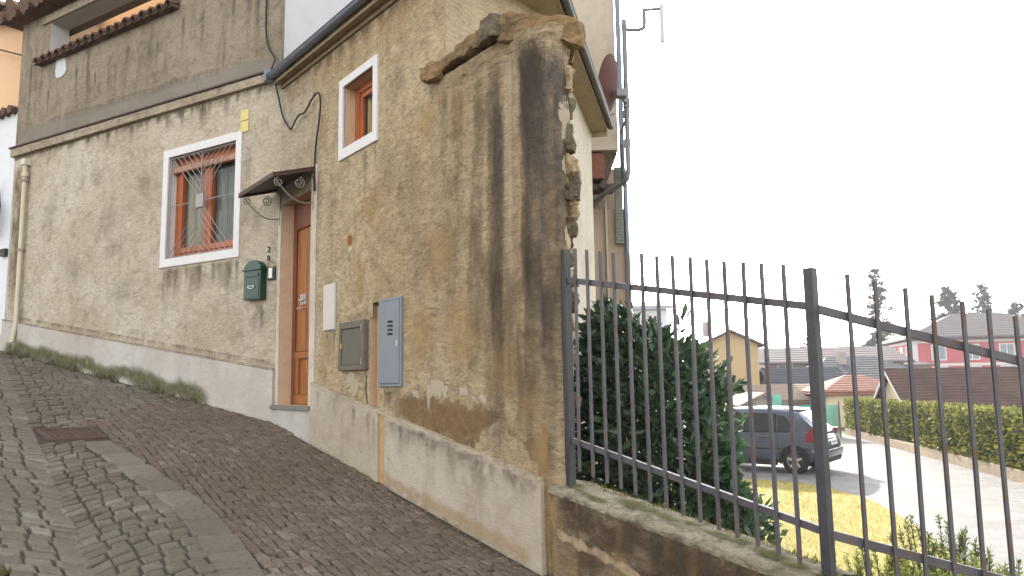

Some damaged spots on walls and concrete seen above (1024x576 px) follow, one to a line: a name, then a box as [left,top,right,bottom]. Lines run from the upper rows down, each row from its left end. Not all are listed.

leakage [474,48,566,181]
spalling [558,65,582,370]
peeling [399,380,498,446]